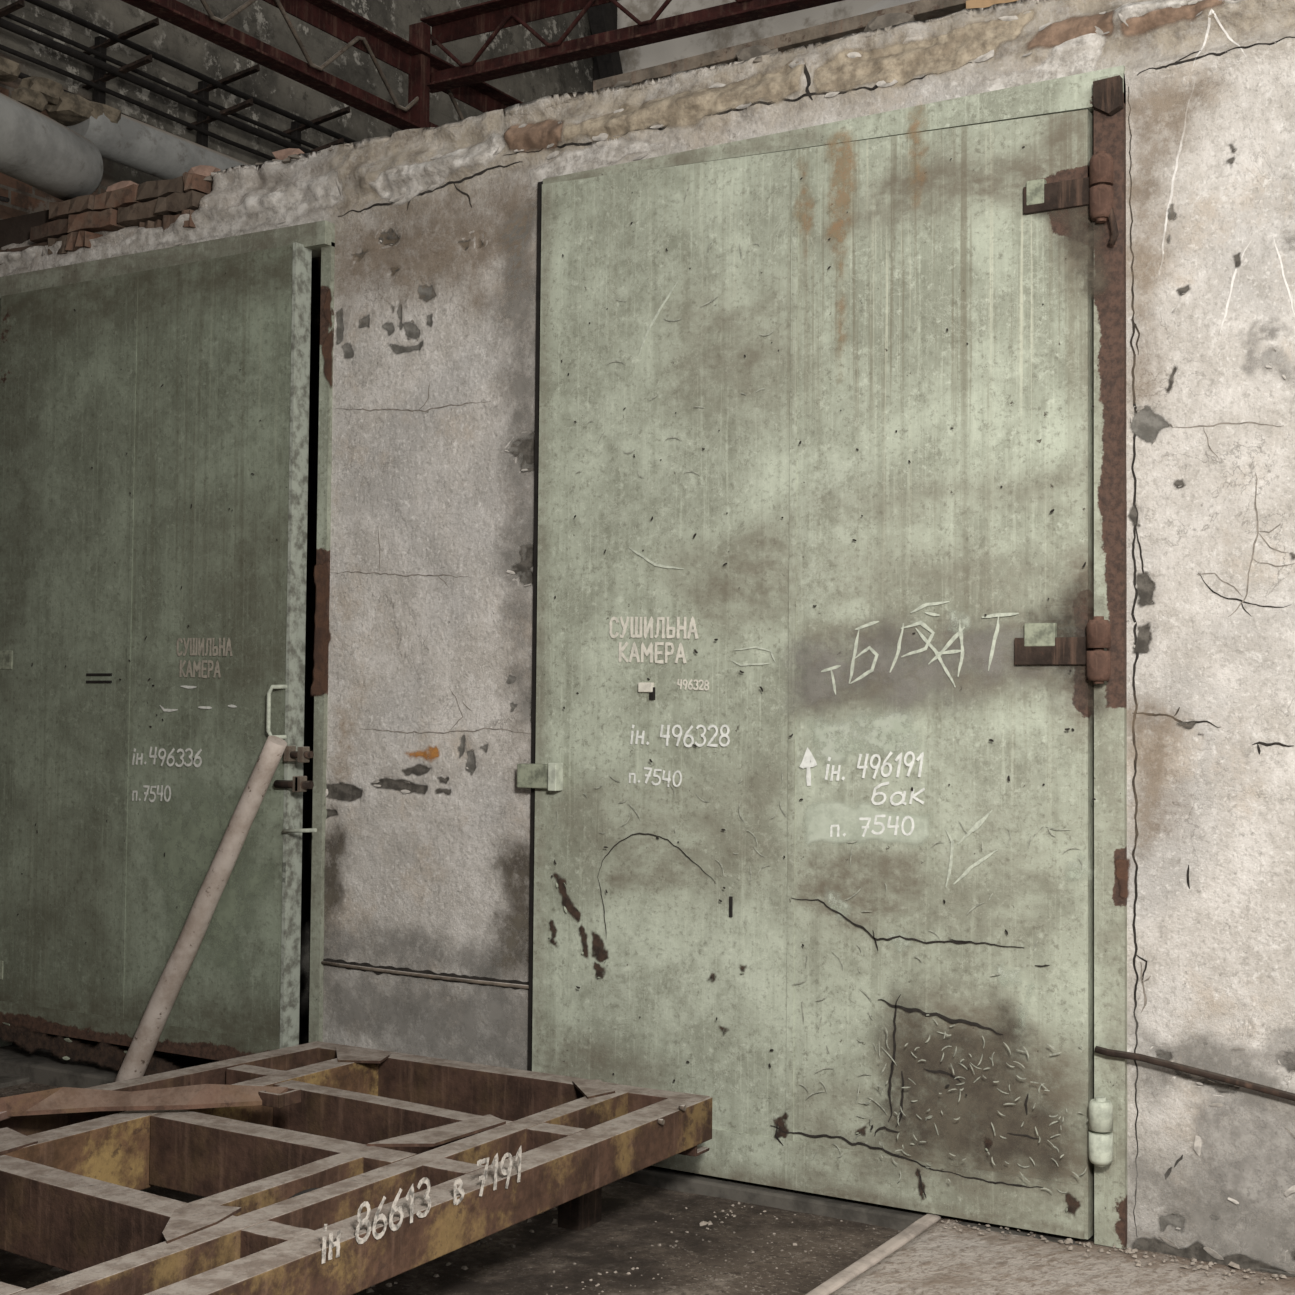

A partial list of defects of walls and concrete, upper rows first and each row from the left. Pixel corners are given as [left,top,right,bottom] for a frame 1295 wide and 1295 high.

crack [705,62,972,116]
flaking render [0,169,343,277]
crack [338,126,667,217]
rust [828,133,853,242]
rust [322,288,334,387]
flaking render [336,285,436,358]
rust [311,559,331,696]
crack [1128,36,1295,1236]
flaking render [325,764,451,818]
flaking render [458,735,488,776]
crack [792,898,1049,967]
crack [770,994,1044,1197]